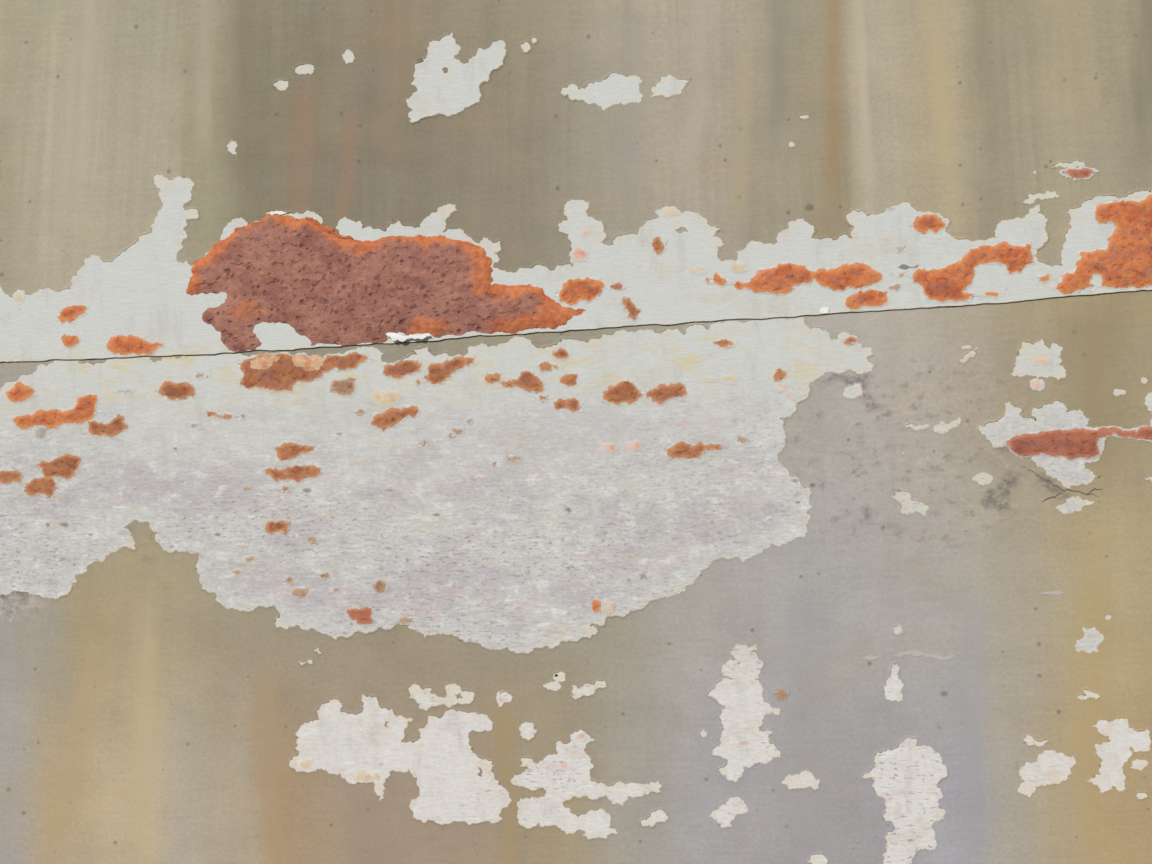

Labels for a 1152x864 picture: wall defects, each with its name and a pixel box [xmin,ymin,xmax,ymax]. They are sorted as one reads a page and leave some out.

peeling [404,30,539,125]
rust [186,0,642,432]
rust [686,192,1152,312]
rust [0,452,83,499]
rust [0,380,129,439]
peeling [0,172,1152,667]
rust [600,378,689,406]
rust [1003,425,1152,460]
peeling [288,681,671,841]
peeling [698,642,782,830]
peeling [861,735,950,864]
peeling [1085,715,1152,801]